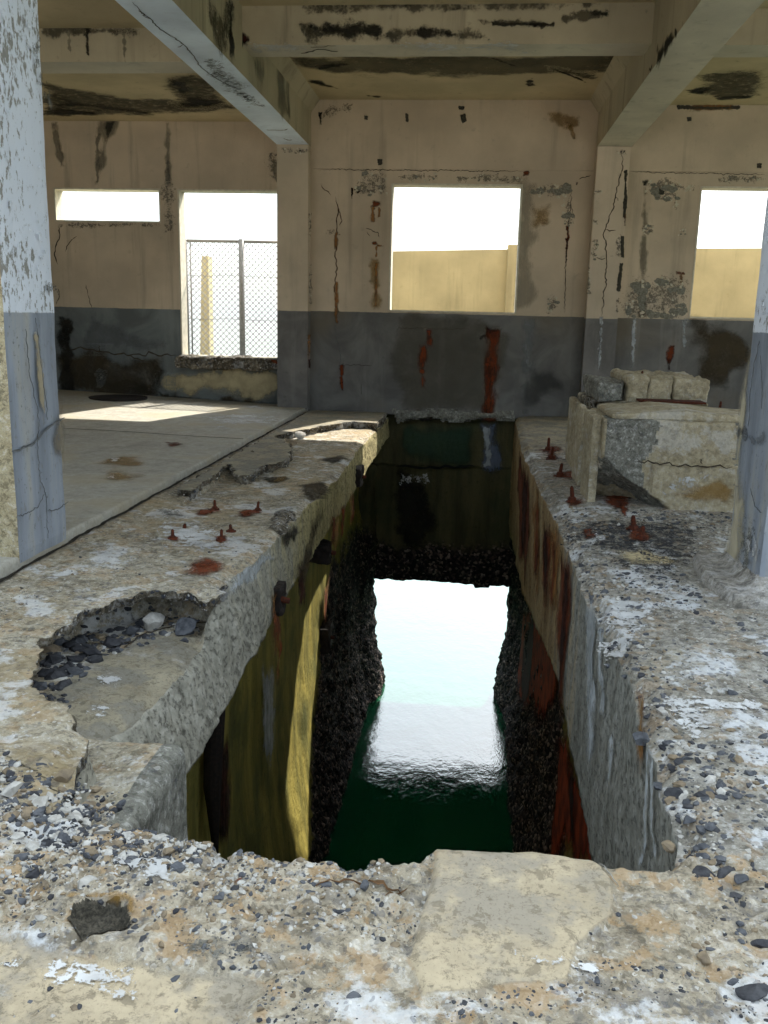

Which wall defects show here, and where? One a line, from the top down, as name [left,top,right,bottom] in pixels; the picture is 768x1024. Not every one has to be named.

water stain [250,3,614,87]
water stain [42,75,235,182]
peeling [615,170,695,320]
crack [598,152,765,355]
corrosion [482,327,500,421]
water stain [683,319,751,385]
crack [0,318,308,582]
crack [635,459,761,513]
corrosion [189,557,221,575]
corrosion [517,455,571,718]
spalling [0,574,228,802]
spalling [67,891,133,942]